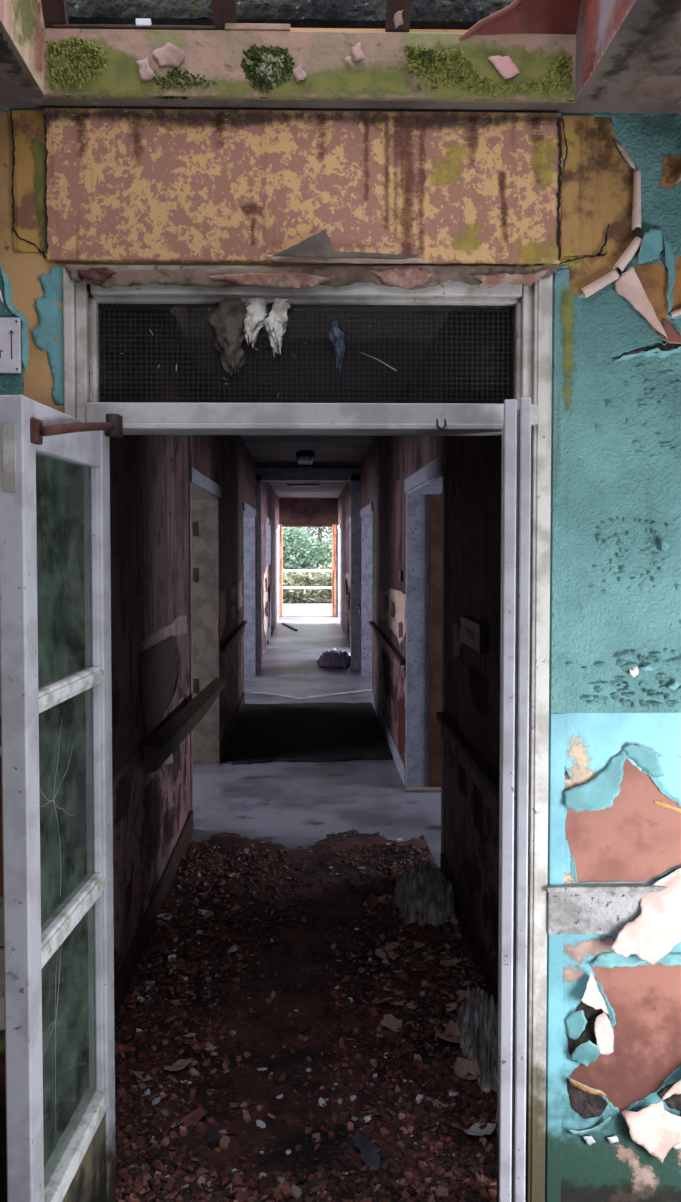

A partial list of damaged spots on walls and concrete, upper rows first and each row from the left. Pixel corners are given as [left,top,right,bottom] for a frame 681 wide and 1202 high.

peeling [0,111,64,413]
crack [556,117,609,264]
peeling [559,113,681,344]
peeling [563,736,681,1199]